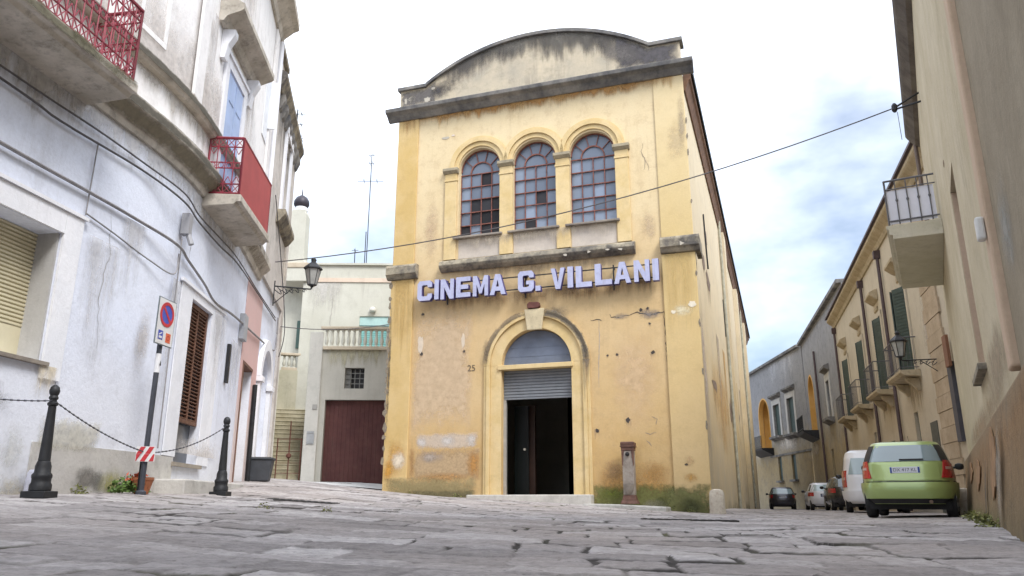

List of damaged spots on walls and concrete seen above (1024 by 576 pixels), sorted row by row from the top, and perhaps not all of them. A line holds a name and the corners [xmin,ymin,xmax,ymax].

damp [402,32,676,106]
damp [435,81,640,120]
peeling [671,301,696,314]
crack [591,311,667,370]
damp [411,451,478,480]
damp [636,471,710,513]